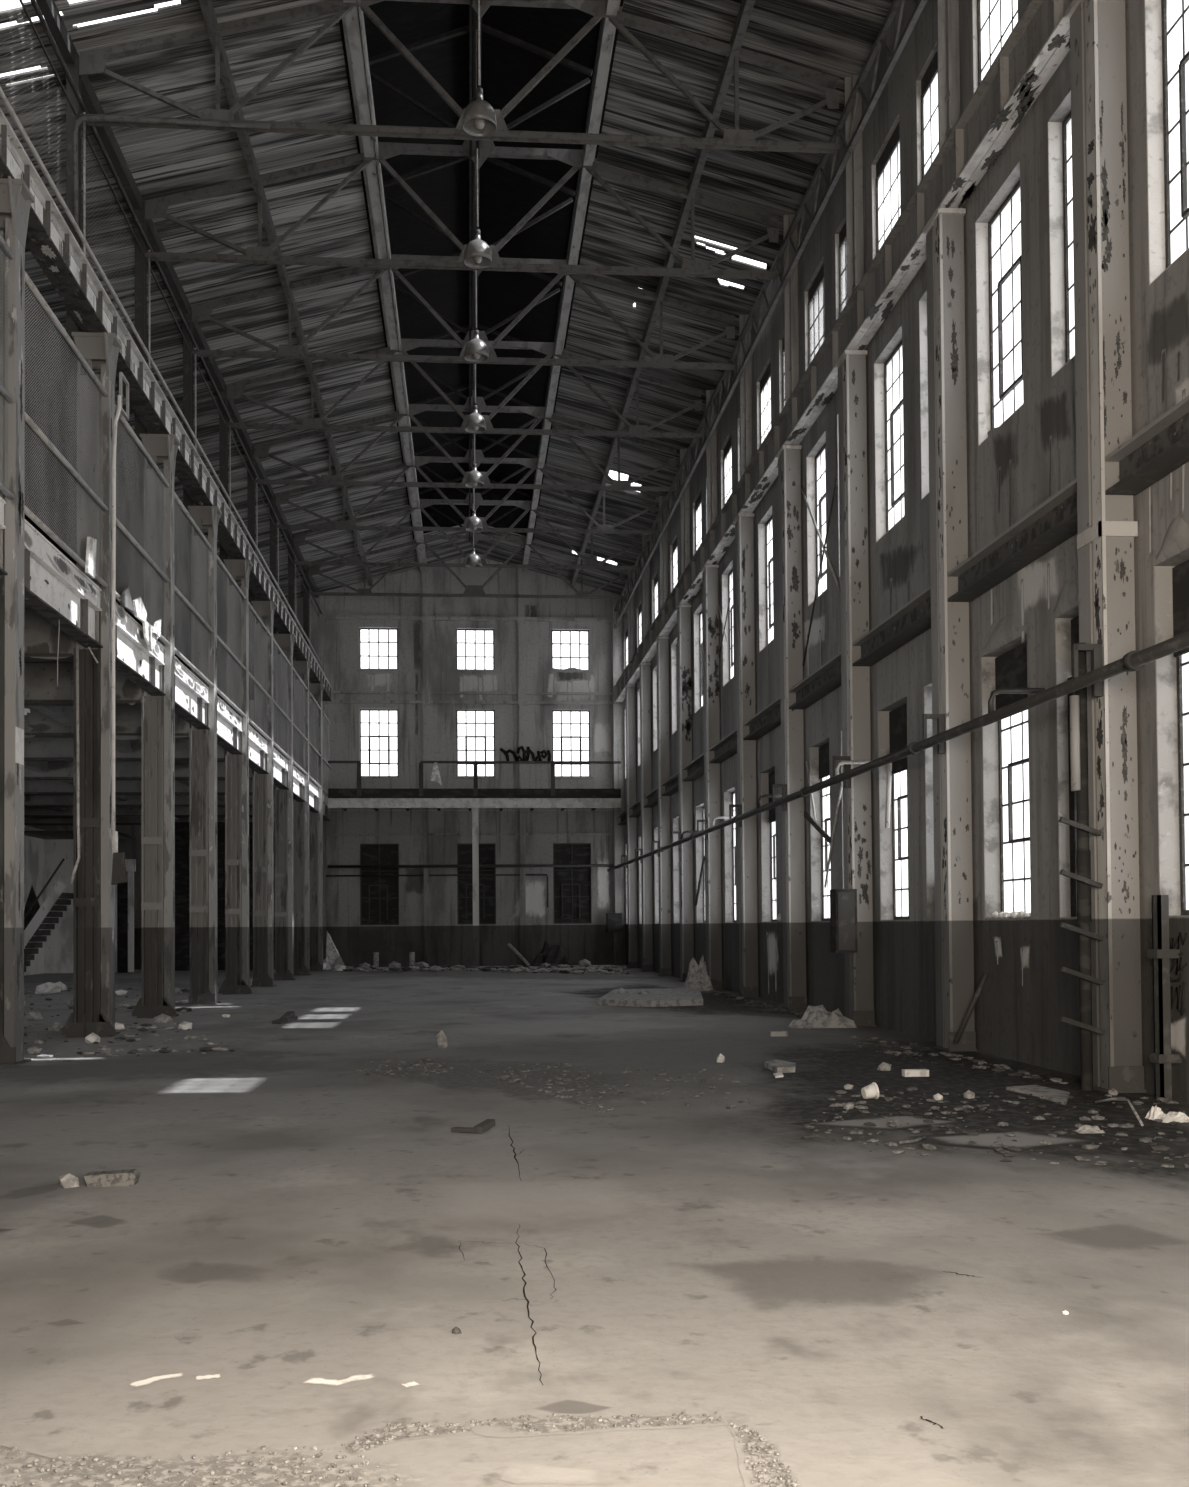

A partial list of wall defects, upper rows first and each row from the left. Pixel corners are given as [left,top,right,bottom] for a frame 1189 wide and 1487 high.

peeling [1047,34,1070,51]
peeling [899,67,1041,299]
peeling [1087,100,1126,294]
peeling [865,290,894,321]
peeling [1103,314,1128,445]
peeling [0,474,303,800]
peeling [1094,542,1132,644]
peeling [1096,671,1137,914]
crack [508,1125,522,1180]
crack [458,1225,557,1385]
leakage [624,1247,1001,1322]